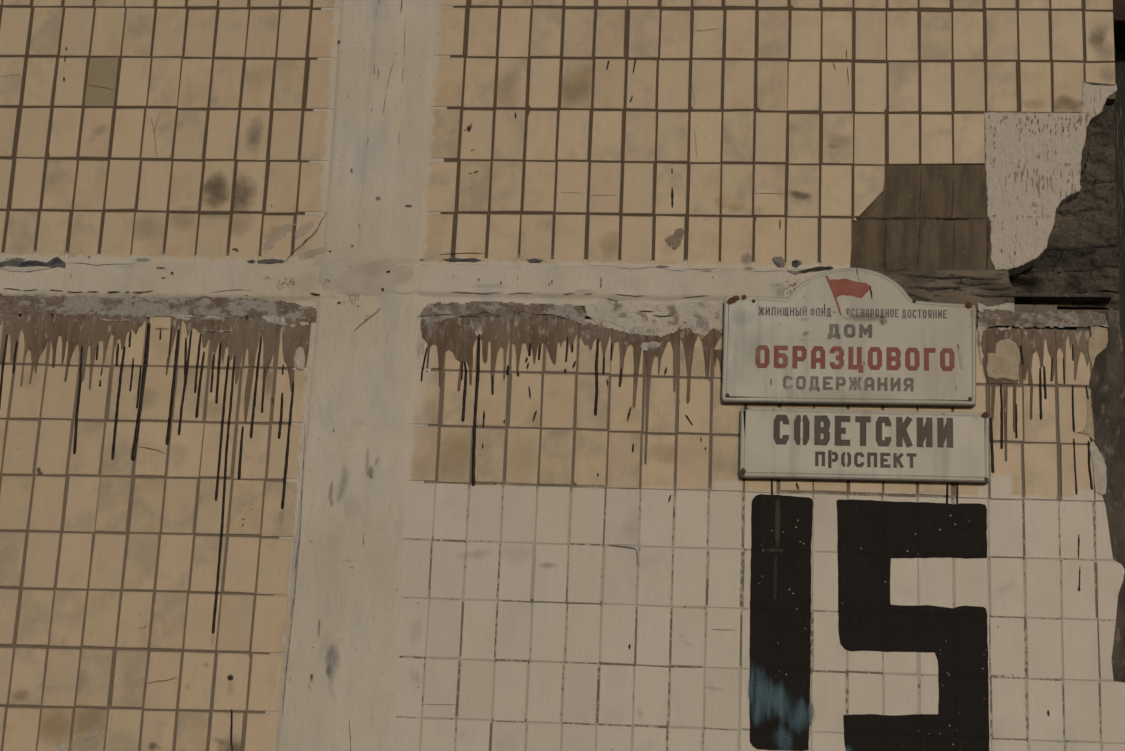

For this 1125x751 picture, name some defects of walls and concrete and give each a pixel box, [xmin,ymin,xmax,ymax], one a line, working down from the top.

peeling [0,257,72,276]
damp [0,322,310,634]
peeling [0,293,320,333]
peeling [294,347,305,370]
damp [421,334,576,486]
damp [589,338,723,465]
peeling [774,256,833,274]
flaking render [850,81,1125,682]
damp [983,343,1093,495]